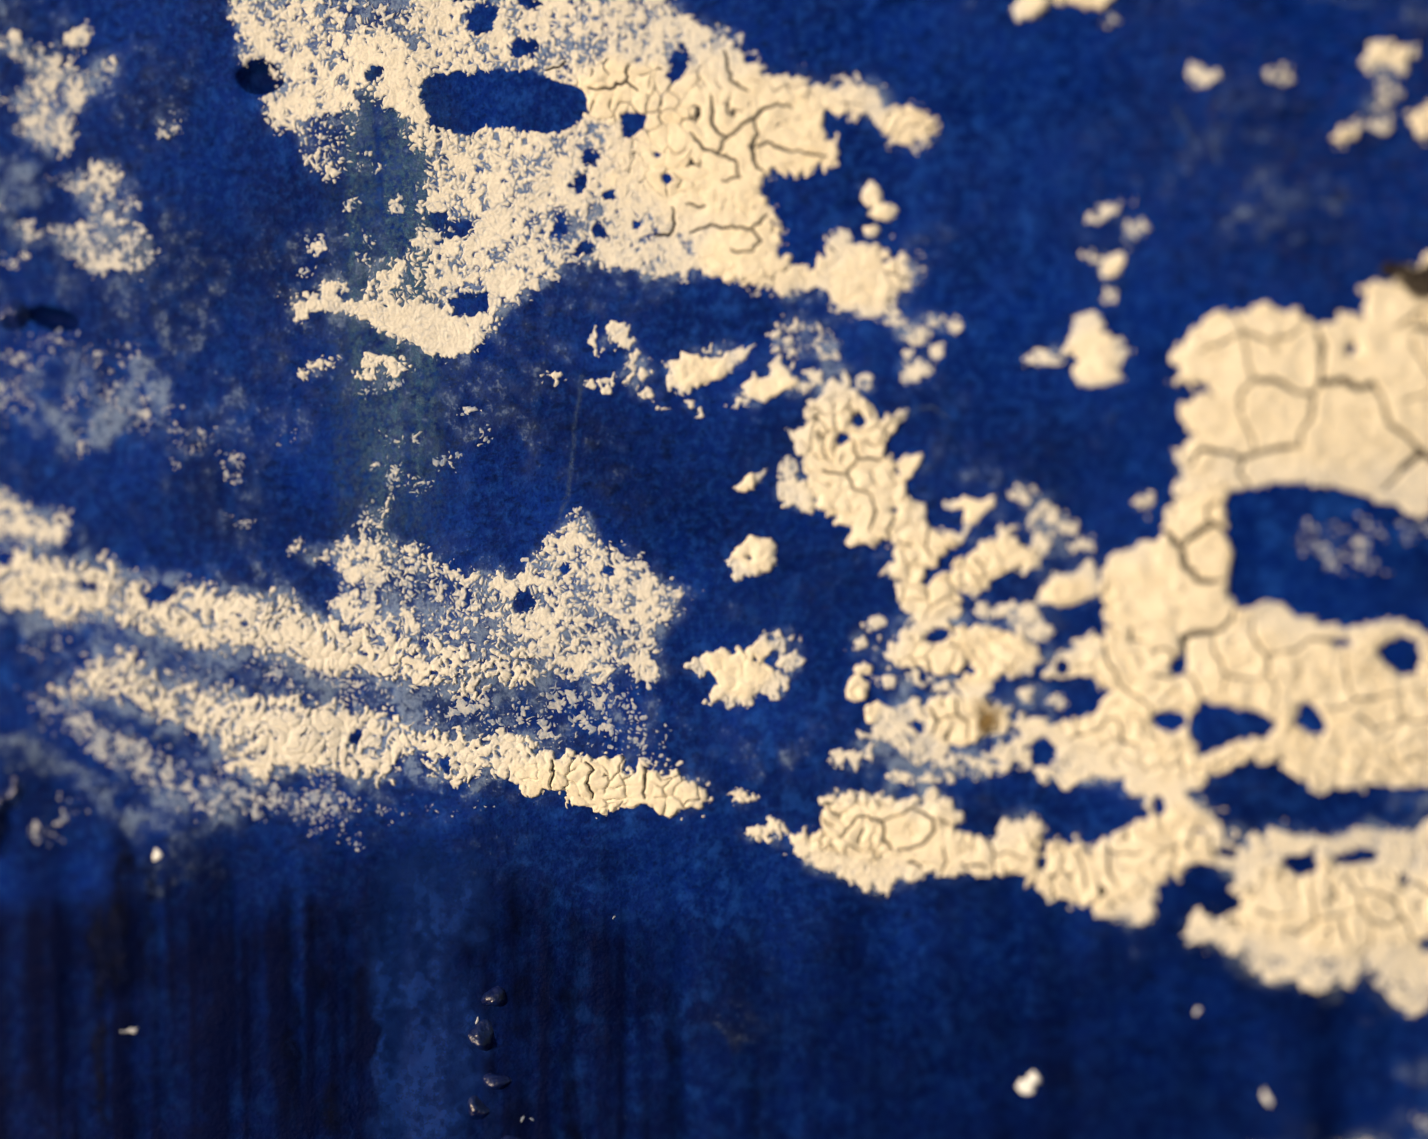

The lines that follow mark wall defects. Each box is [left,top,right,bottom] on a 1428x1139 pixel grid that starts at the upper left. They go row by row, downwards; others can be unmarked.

crack [546,61,566,71]
crack [589,64,638,91]
crack [654,50,827,254]
peeling [0,304,246,485]
peeling [226,0,1428,1017]
crack [824,439,896,535]
crack [1068,317,1428,748]
peeling [0,428,760,851]
crack [929,699,970,739]
crack [840,805,1027,877]
crack [1075,844,1144,888]
peeling [1016,1070,1040,1094]